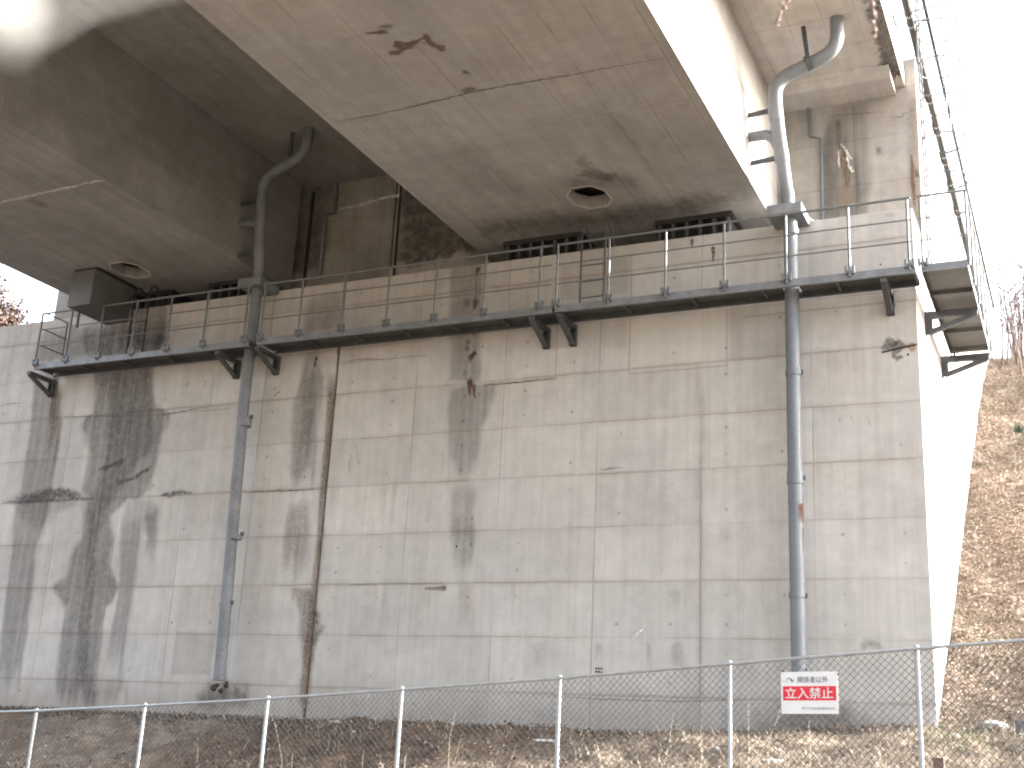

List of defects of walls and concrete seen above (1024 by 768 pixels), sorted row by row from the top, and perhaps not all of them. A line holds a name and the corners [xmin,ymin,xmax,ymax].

spalling [367,26,445,55]
crack [338,57,667,121]
spalling [882,338,916,359]
leakage [20,489,78,503]